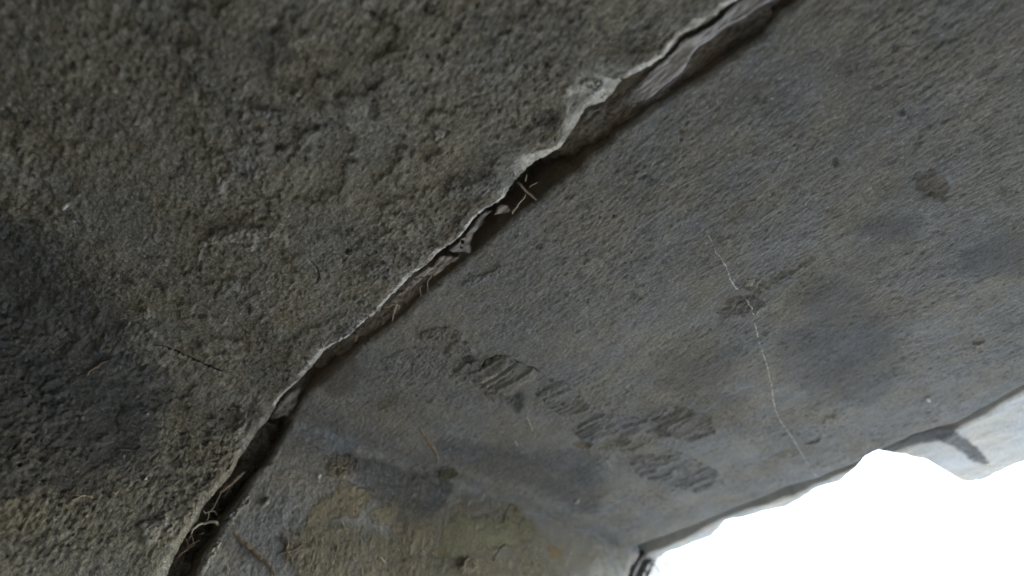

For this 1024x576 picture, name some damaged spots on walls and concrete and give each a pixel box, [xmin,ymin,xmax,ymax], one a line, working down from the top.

crack [152,345,228,373]
crack [449,355,542,376]
crack [706,231,824,486]